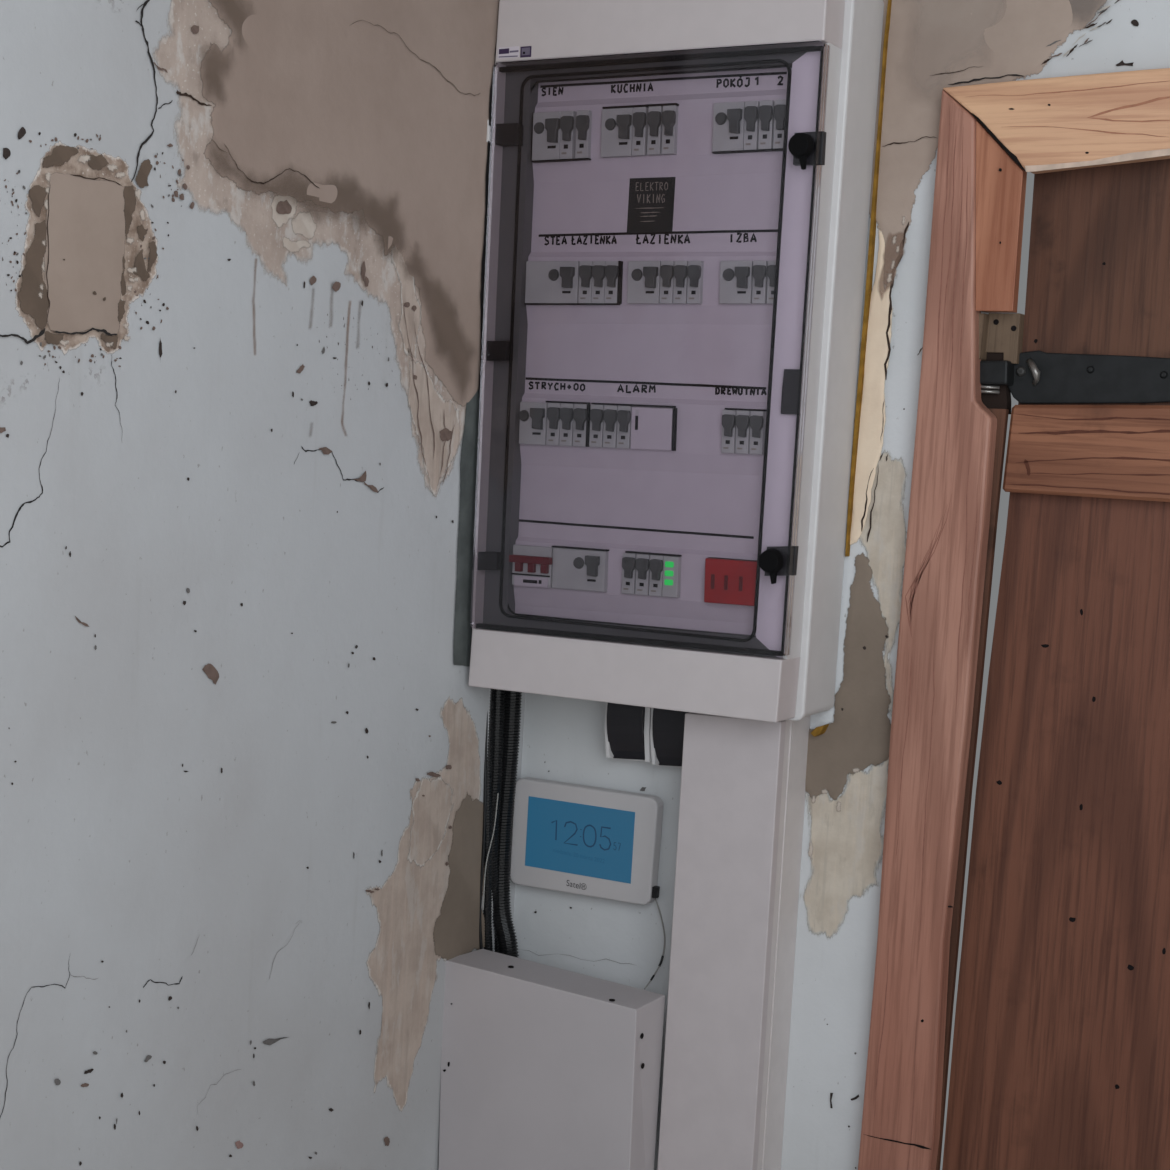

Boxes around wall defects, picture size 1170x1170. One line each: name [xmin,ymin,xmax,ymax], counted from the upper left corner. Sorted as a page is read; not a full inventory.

crack [0,0,212,427]
flaking render [4,0,499,496]
crack [214,141,319,188]
flaking render [869,0,1119,297]
crack [0,378,60,547]
flaking render [803,451,906,938]
crack [0,953,98,1117]
peeling [365,696,487,1111]